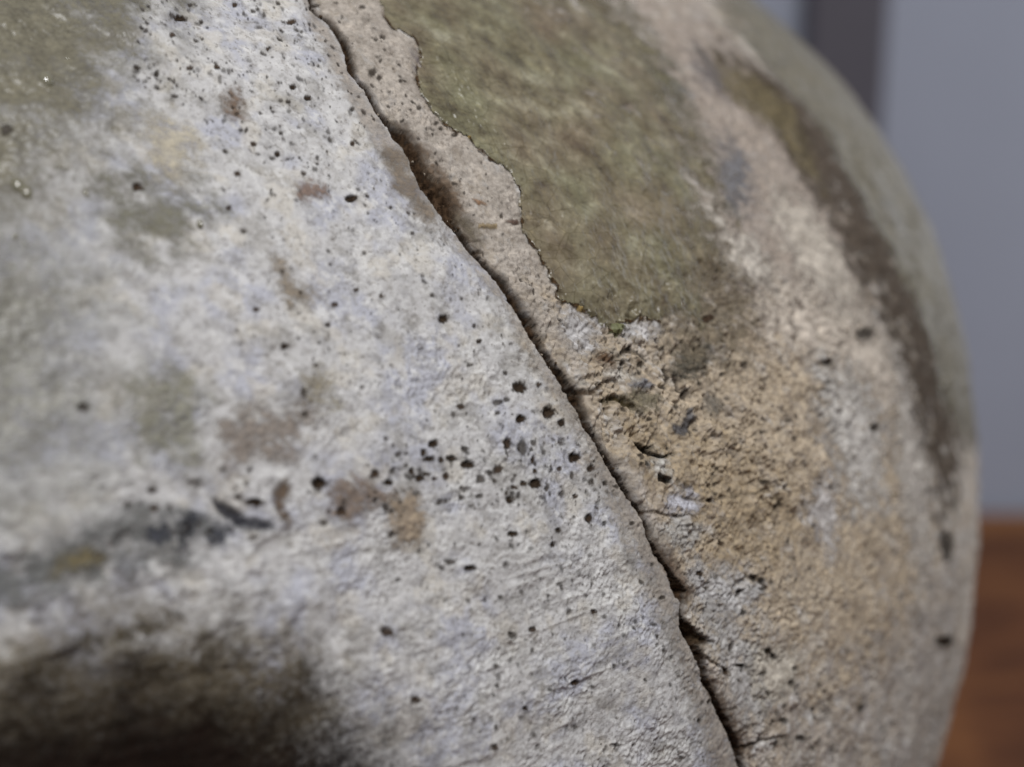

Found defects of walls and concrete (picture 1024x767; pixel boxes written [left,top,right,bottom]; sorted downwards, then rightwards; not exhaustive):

peeling [318,0,661,359]
spalling [512,381,542,393]
crack [308,0,784,767]
spalling [540,406,565,426]
spalling [601,396,633,408]
spalling [404,439,503,482]
spalling [502,438,542,503]
spalling [557,453,595,484]
spalling [635,445,667,459]